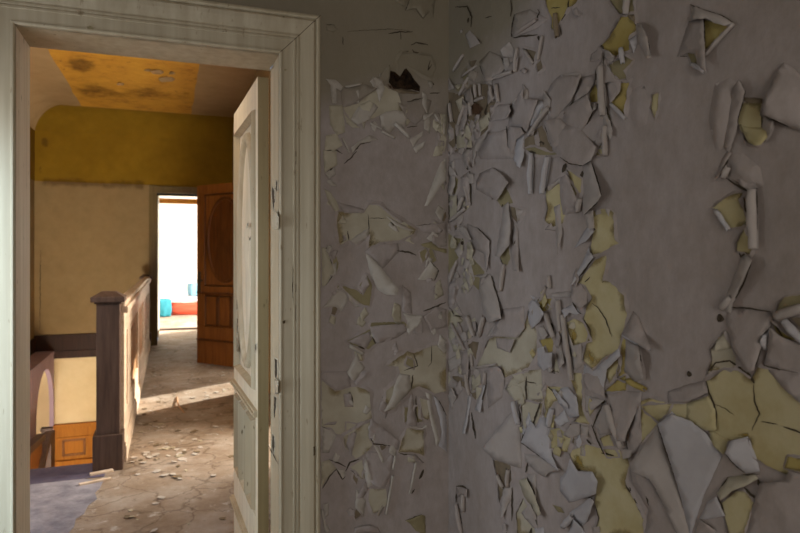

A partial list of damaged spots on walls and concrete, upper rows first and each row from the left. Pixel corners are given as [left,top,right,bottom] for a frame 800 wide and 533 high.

peeling [48,49,199,114]
peeling [321,0,800,533]